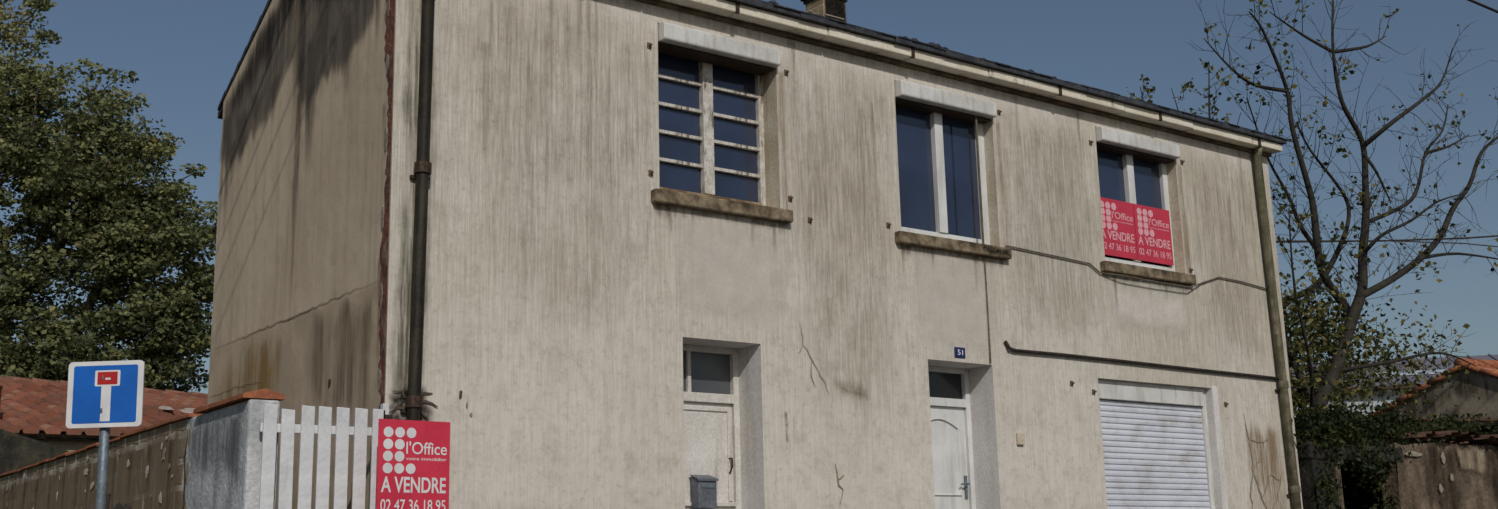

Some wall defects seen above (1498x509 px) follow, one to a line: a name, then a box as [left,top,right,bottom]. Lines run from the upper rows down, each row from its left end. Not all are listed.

leakage [223,0,378,177]
leakage [0,421,238,509]